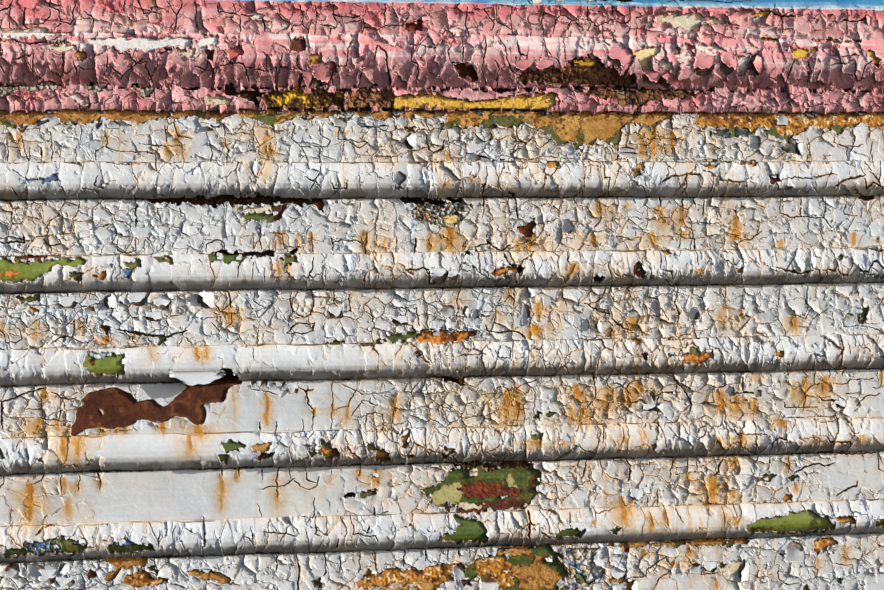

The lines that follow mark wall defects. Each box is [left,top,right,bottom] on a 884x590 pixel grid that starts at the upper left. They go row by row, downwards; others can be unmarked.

peeling [0,242,141,284]
crack [210,233,374,335]
crack [417,127,530,359]
crack [775,133,884,319]
peeling [82,292,171,376]
corrosion [55,368,242,462]
corrosion [500,383,522,423]
crack [587,324,884,476]
corrosion [716,390,758,414]
corrosion [23,483,39,521]
peeling [410,391,541,544]
peeling [0,535,88,590]